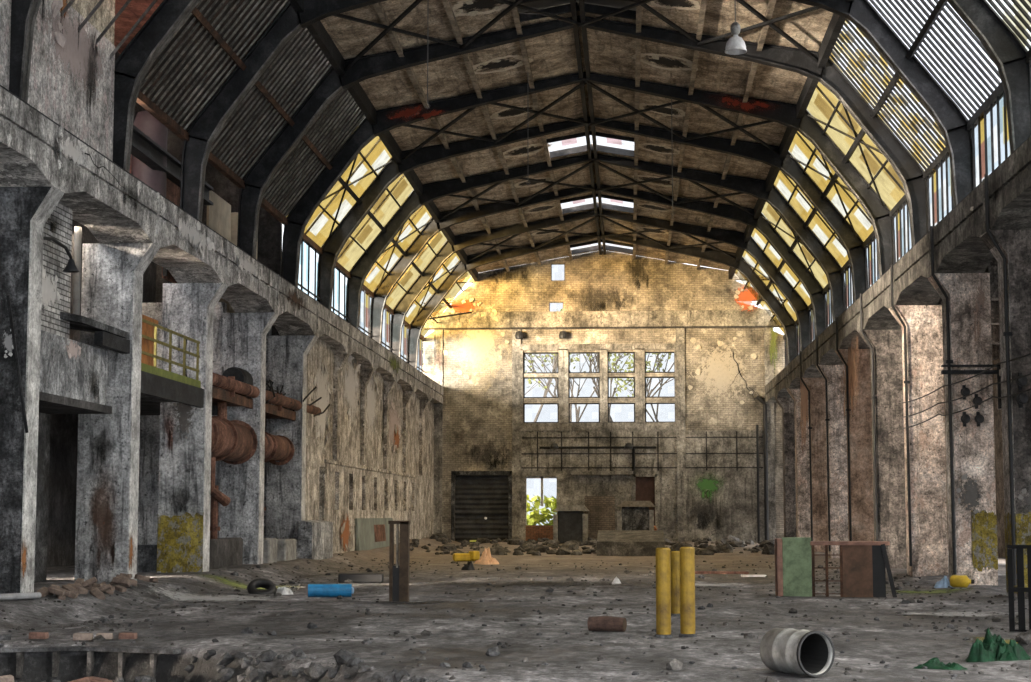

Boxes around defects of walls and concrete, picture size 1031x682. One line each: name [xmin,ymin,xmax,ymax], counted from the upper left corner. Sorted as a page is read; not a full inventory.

rust [89,471,117,567]